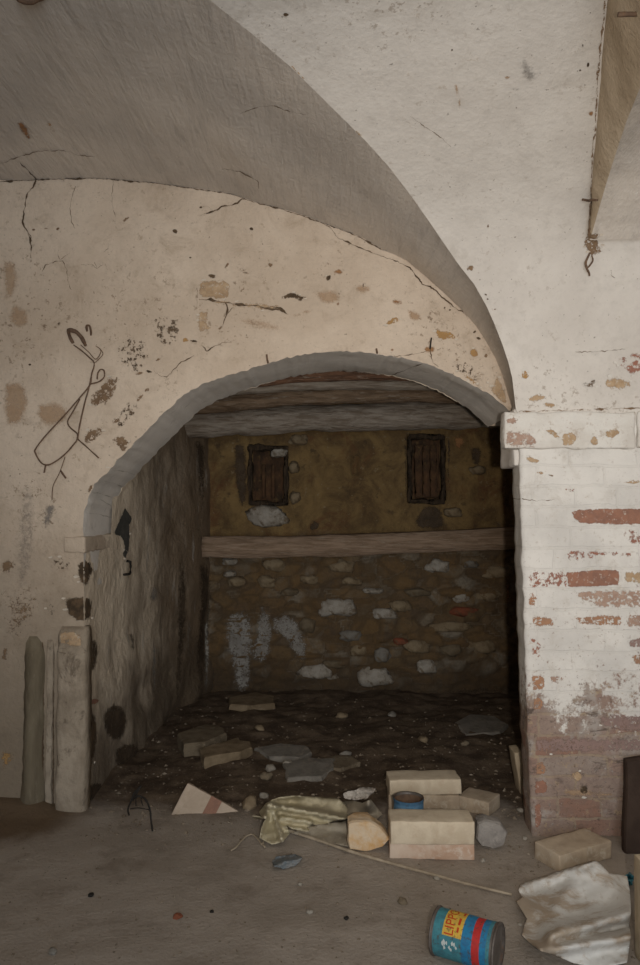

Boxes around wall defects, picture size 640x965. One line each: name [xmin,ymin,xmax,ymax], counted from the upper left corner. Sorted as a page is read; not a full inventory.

crack [0,150,464,313]
peeling [118,339,160,375]
peeling [154,312,222,344]
crack [154,290,287,377]
peeling [502,417,553,476]
peeling [546,430,576,445]
peeling [591,429,619,445]
spalling [115,509,132,560]
peeling [529,508,640,627]
spalling [44,597,94,621]
spalling [532,676,563,710]
damp [103,704,138,765]